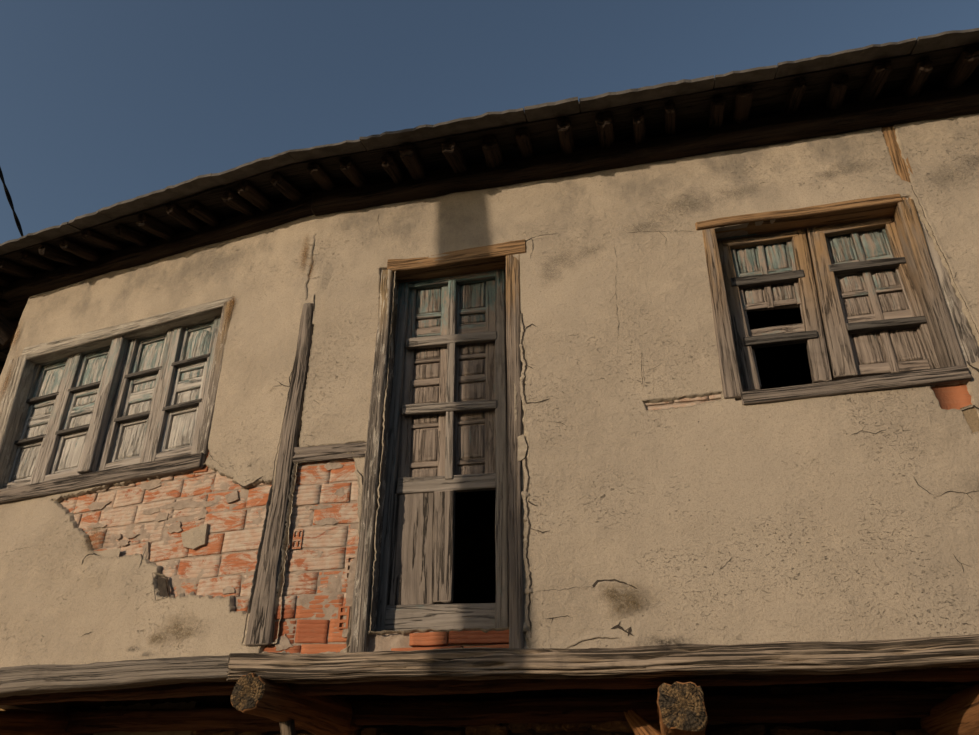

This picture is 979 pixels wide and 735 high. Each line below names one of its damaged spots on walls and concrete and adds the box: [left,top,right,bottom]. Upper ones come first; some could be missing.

flaking render [880,125,979,346]
flaking render [51,402,287,645]
flaking render [258,440,365,654]
flaking render [367,267,509,651]
flaking render [513,338,532,649]
crack [520,313,548,404]
crack [522,456,637,649]
crack [912,477,974,501]
flaking render [929,381,979,433]